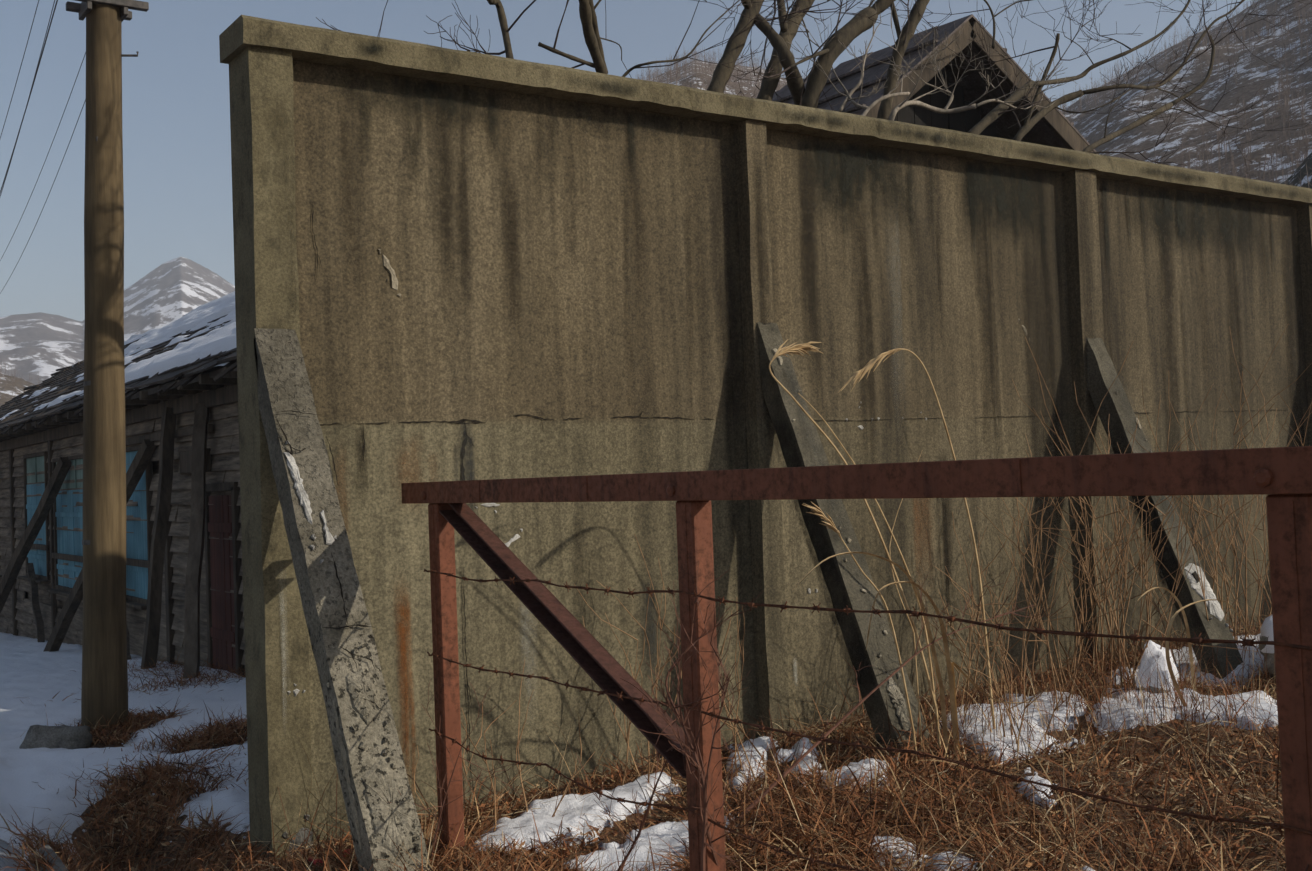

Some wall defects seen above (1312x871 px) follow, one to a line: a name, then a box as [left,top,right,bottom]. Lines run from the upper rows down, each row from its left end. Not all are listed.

crack [276,410,581,484]
crack [613,411,714,420]
water stain [794,499,875,693]
water stain [1129,496,1199,619]